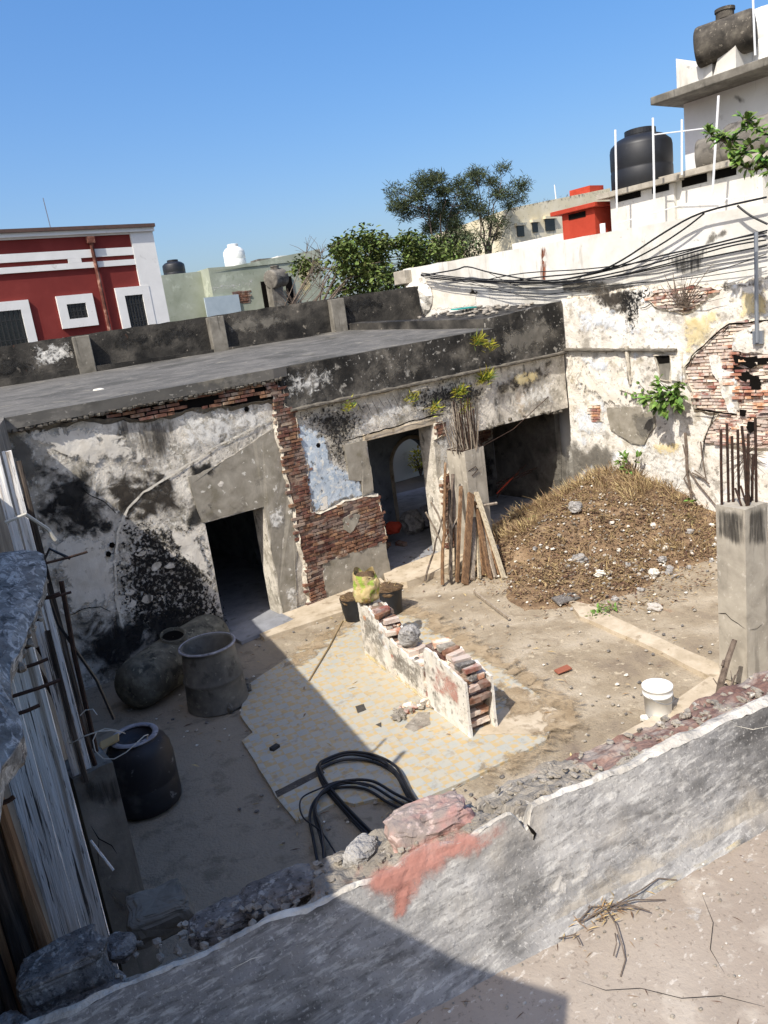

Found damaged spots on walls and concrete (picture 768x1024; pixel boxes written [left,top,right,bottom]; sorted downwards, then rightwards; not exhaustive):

water stain [10,422,213,679]
spalling [7,377,388,605]
water stain [405,361,553,418]
water stain [563,278,652,342]
spalling [609,276,768,315]
spalling [653,314,768,506]